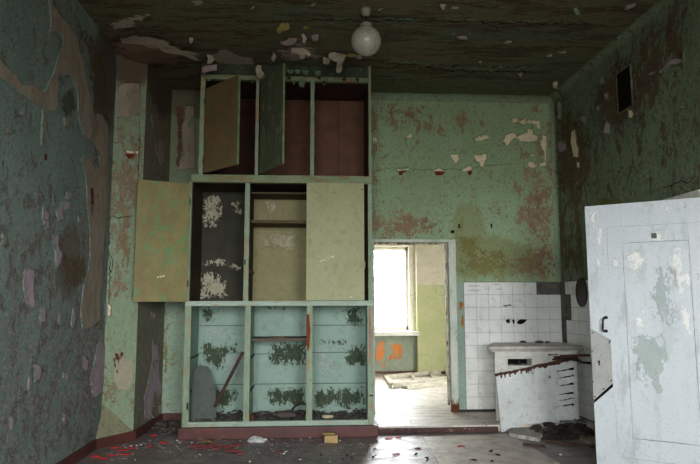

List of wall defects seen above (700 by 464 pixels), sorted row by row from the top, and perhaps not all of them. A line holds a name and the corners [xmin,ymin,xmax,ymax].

spalling [111,13,264,79]
spalling [271,23,362,88]
crack [386,60,559,73]
spalling [115,82,141,119]
water stain [555,55,643,198]
spalling [0,0,112,329]
peeling [499,100,587,278]
water stain [457,237,506,276]
spalling [81,338,134,399]
spalling [144,326,168,421]
peeling [375,341,402,367]